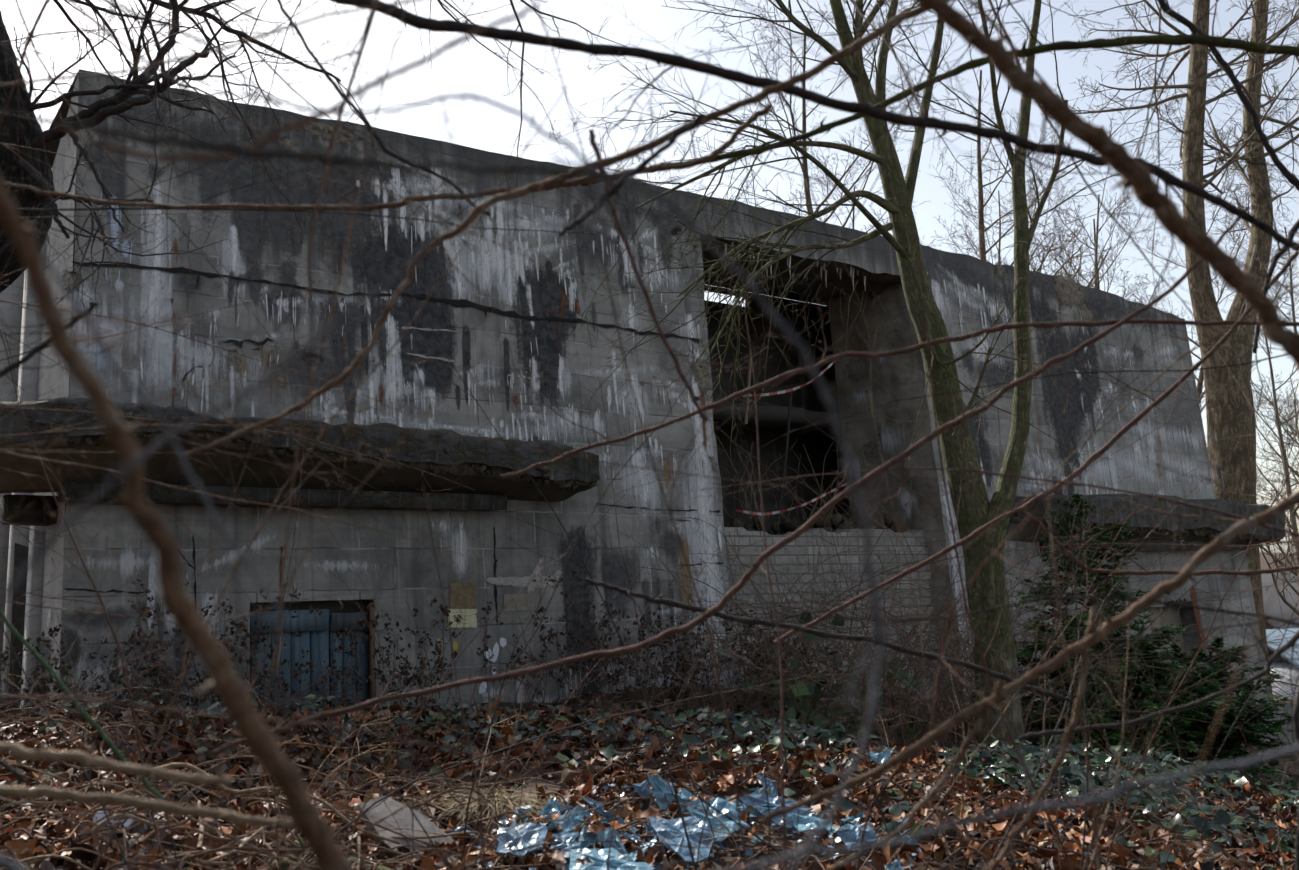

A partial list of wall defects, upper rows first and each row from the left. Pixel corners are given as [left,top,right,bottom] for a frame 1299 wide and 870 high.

damp [68,103,732,703]
damp [927,256,1219,495]